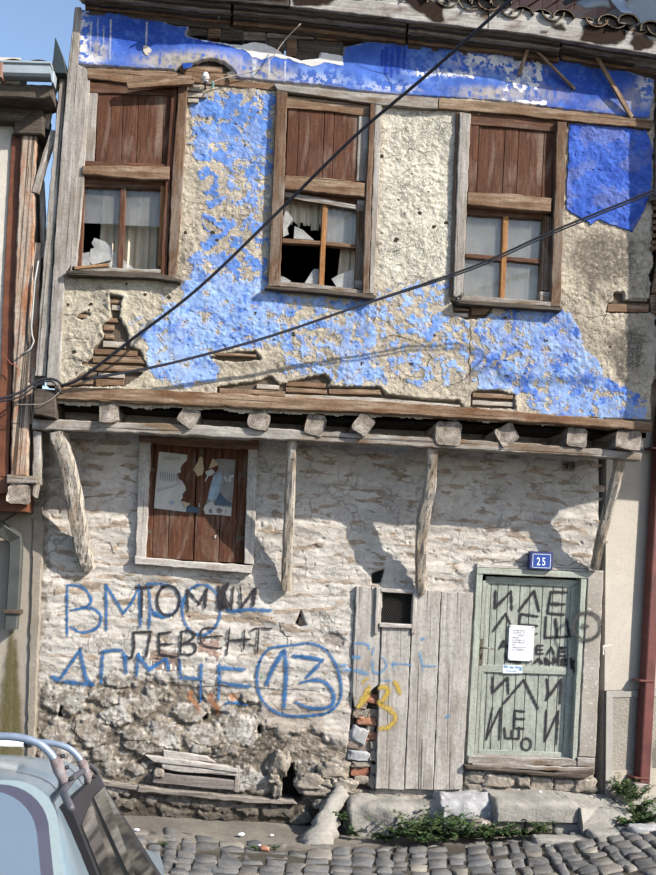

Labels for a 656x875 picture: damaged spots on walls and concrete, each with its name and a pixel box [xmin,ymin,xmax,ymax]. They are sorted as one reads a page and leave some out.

peeling [211,41,344,67]
peeling [416,53,547,106]
peeling [64,90,654,419]
water stain [4,641,19,733]
flaking render [268,693,378,809]